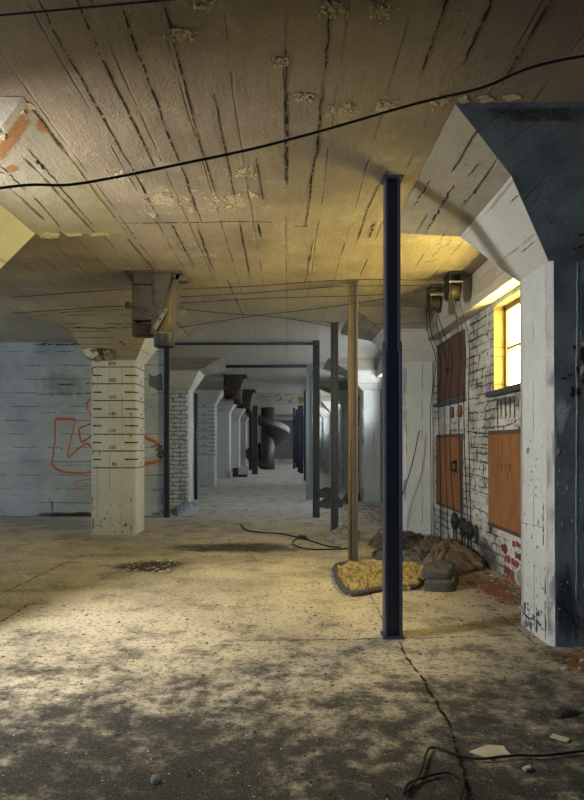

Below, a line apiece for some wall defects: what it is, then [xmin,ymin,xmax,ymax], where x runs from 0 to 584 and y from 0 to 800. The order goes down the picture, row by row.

crack [462,0,492,65]
rust [0,116,49,157]
crack [27,149,95,228]
crack [38,0,261,319]
crack [282,43,290,184]
crack [294,0,331,284]
crack [358,172,386,240]
crack [427,163,479,262]
crack [467,316,519,514]
crack [522,234,584,640]
crack [224,636,378,644]
crack [399,635,505,800]